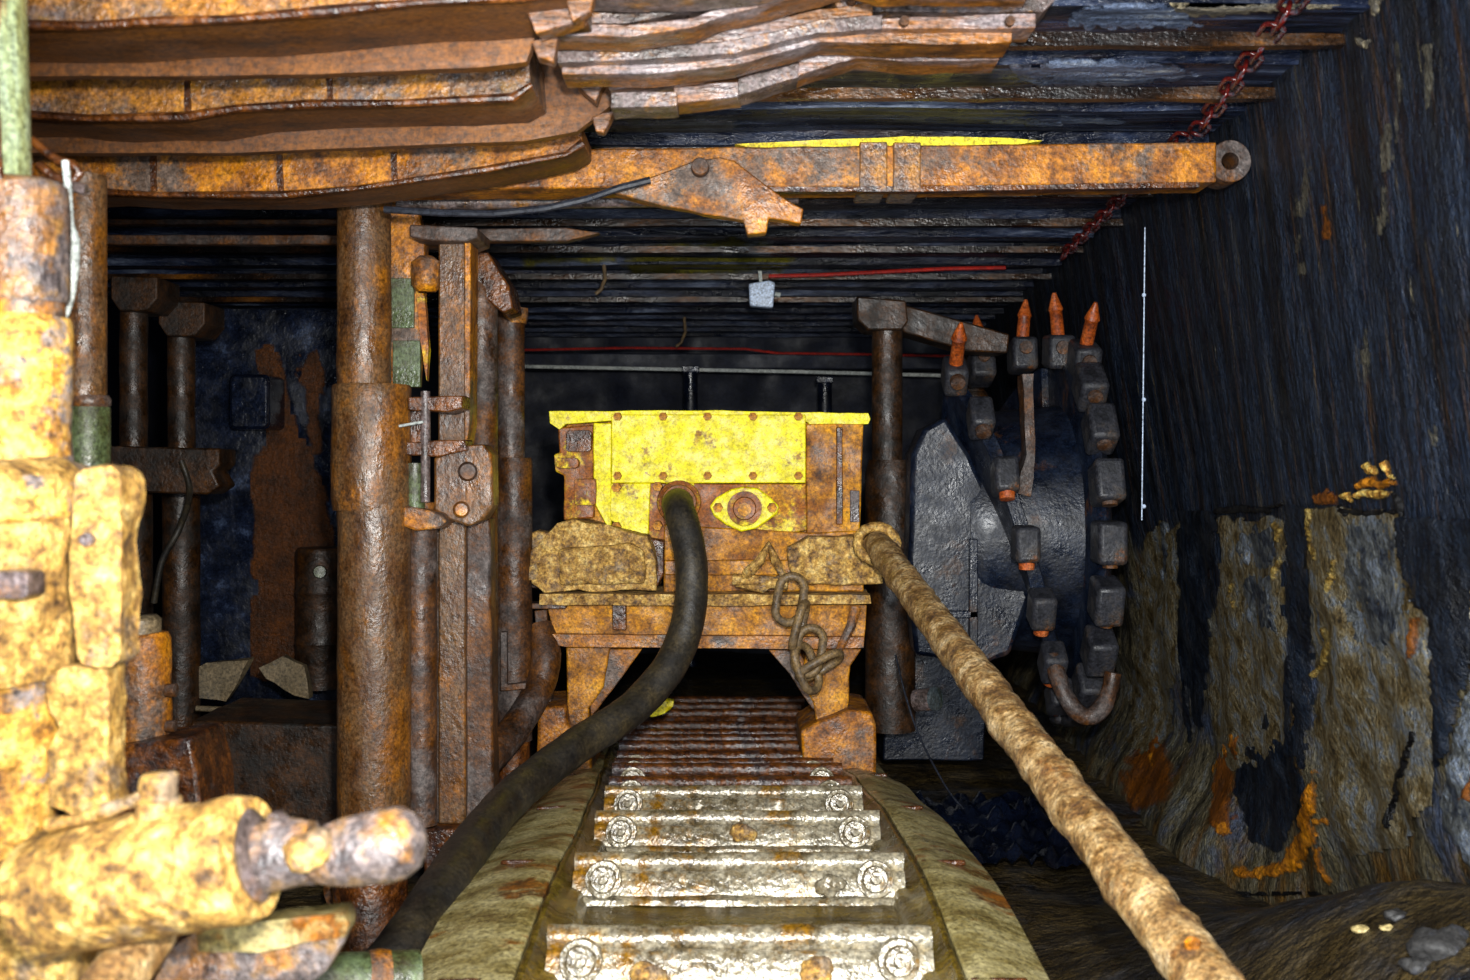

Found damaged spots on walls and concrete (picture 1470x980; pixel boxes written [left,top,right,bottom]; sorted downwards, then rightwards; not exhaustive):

rust [250,344,334,686]
rust [1233,770,1331,884]